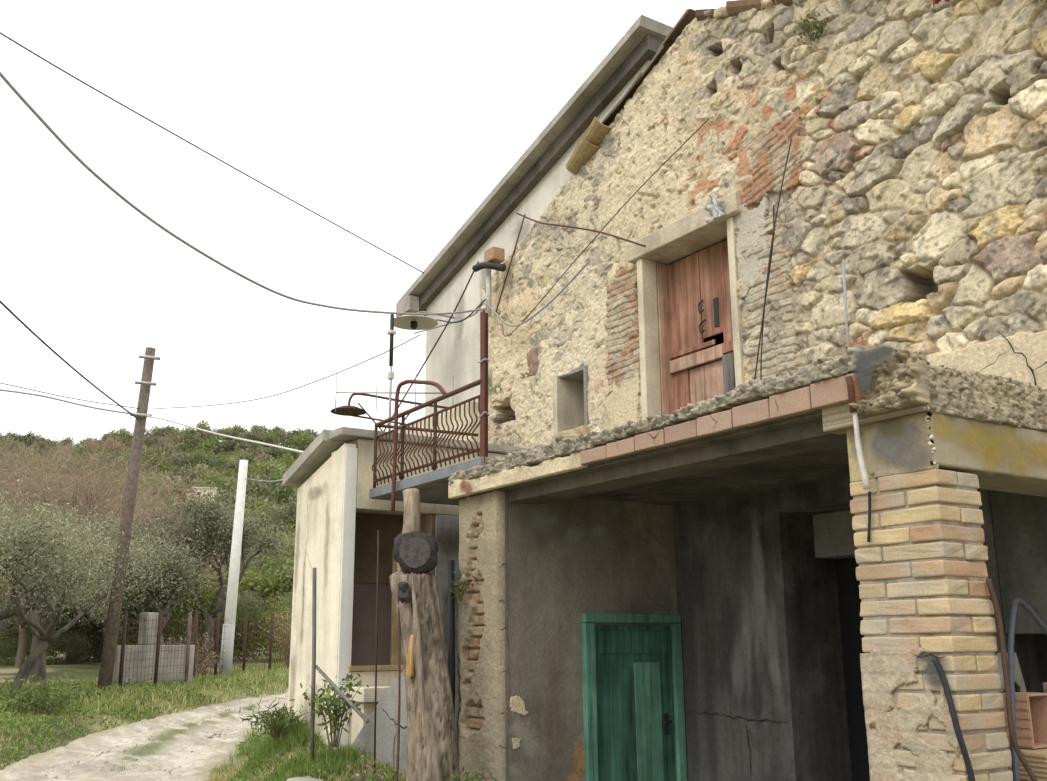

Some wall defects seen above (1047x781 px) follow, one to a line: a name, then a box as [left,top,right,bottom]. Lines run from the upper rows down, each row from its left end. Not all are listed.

crack [979,331,1047,386]
flaking render [457,491,529,781]
flaking render [860,648,961,781]